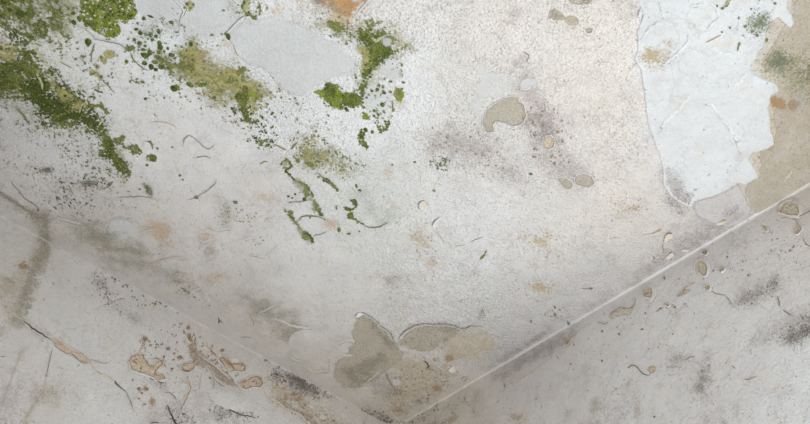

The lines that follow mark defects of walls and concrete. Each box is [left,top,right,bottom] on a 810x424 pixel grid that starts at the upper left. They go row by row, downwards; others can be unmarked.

leakage [111,0,249,127]
leakage [721,0,810,92]
leakage [0,139,122,222]
leakage [244,134,285,150]
peeling [633,0,810,212]
crack [0,302,52,392]
crack [90,362,134,411]
peeling [128,323,336,424]
leakage [209,405,259,421]
leakage [263,357,328,400]
leakage [729,275,810,349]